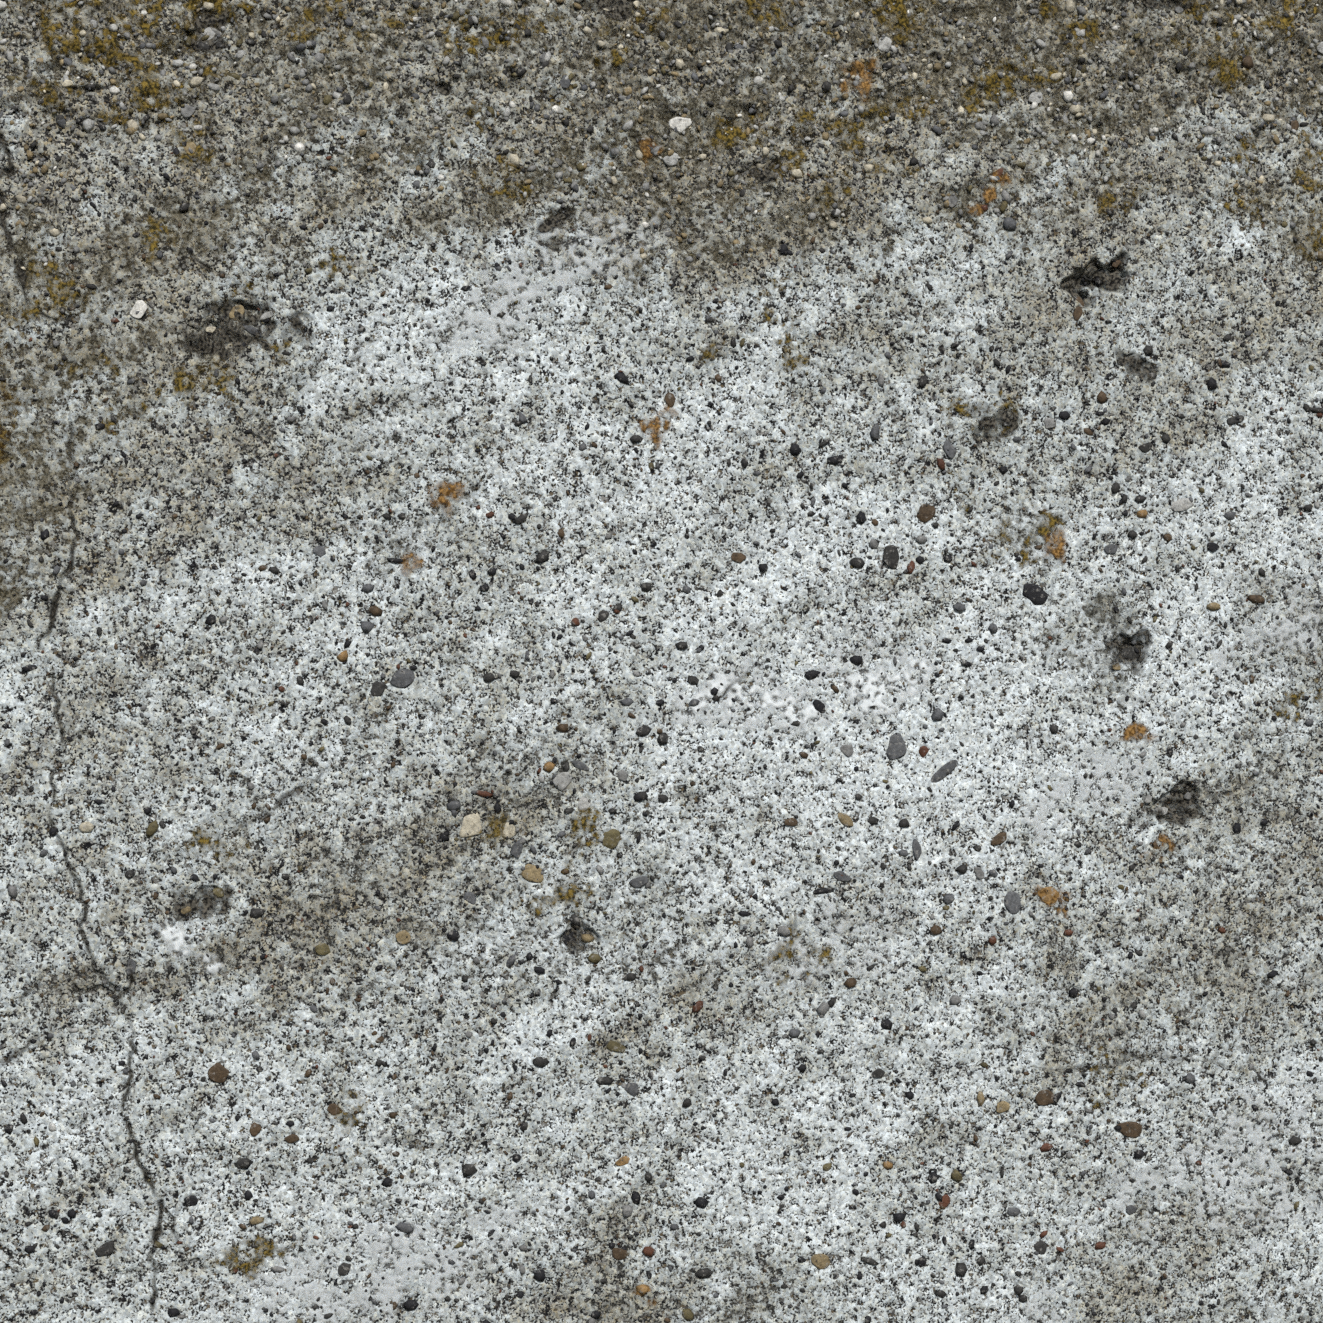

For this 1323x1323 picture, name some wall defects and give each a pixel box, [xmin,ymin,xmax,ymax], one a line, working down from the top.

crack [0,134,73,322]
crack [37,424,134,998]
crack [0,1037,35,1063]
crack [112,1028,198,1307]